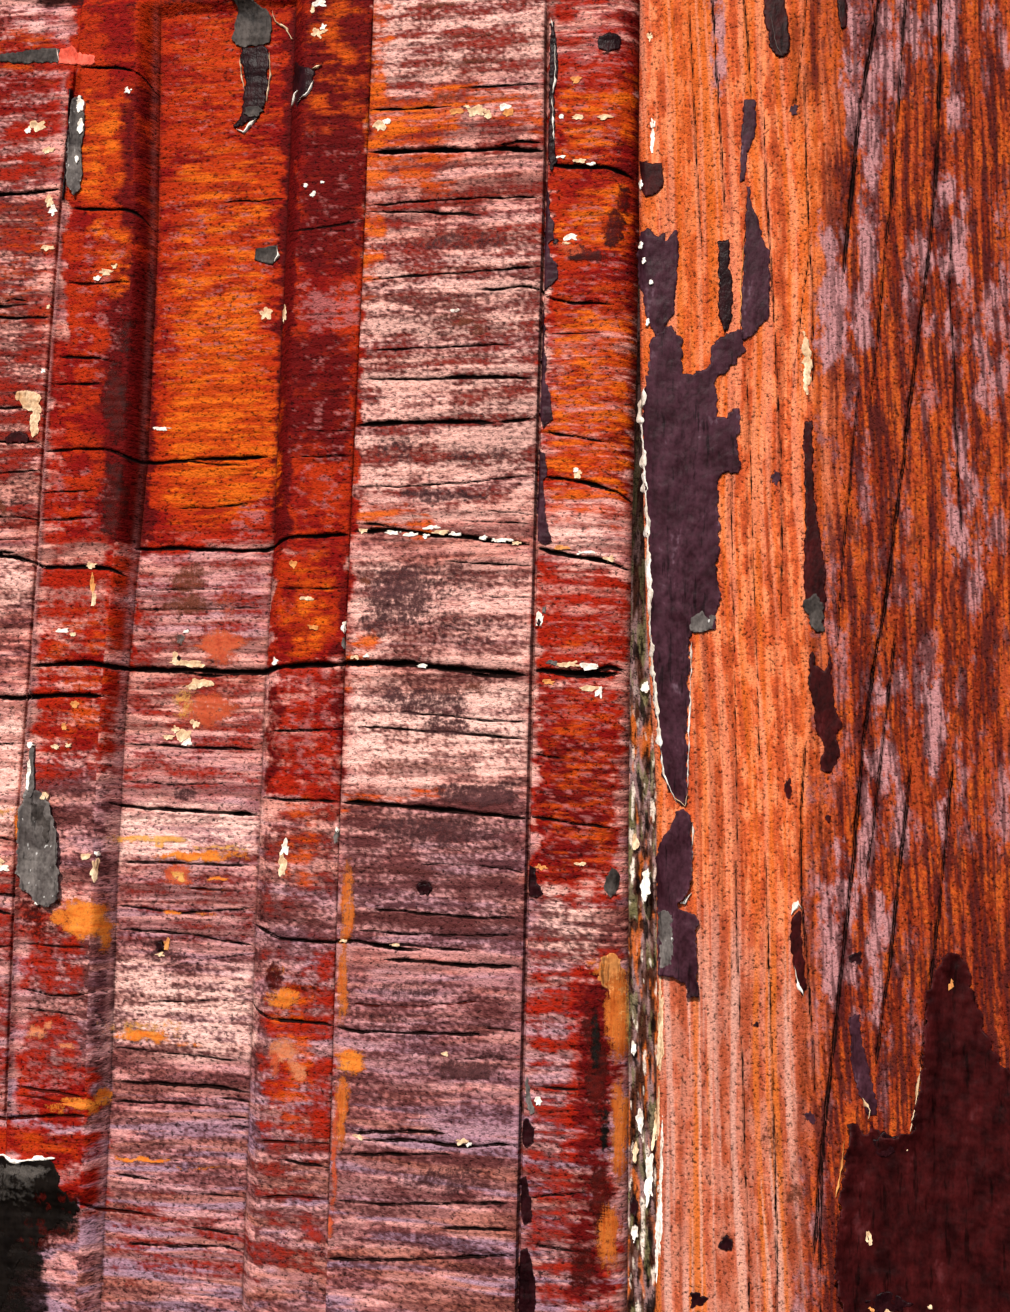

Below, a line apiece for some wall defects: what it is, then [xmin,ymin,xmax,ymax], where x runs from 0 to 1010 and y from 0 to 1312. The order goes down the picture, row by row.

peeling [59,45,96,67]
peeling [231,0,292,133]
peeling [763,0,791,58]
peeling [837,0,848,29]
peeling [42,95,86,196]
crack [0,417,631,610]
peeling [636,99,771,998]
crack [0,660,624,701]
crack [689,0,963,1312]
peeling [0,723,71,907]
peeling [833,952,1010,1312]
peeling [0,1154,83,1309]